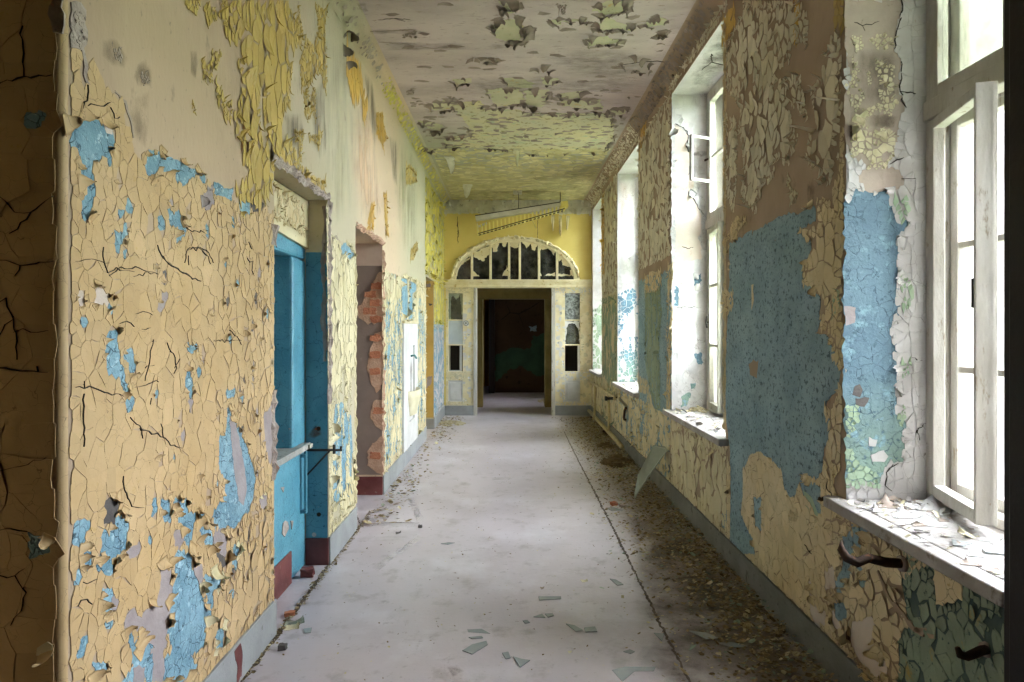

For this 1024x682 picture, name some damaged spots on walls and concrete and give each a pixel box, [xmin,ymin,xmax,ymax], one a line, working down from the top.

flaking render [47,0,90,84]
peeling [62,102,121,224]
peeling [76,278,119,328]
peeling [102,325,141,413]
peeling [112,198,133,259]
crack [0,0,412,682]
peeling [145,0,980,554]
peeling [72,388,284,682]
peeling [803,524,1004,682]